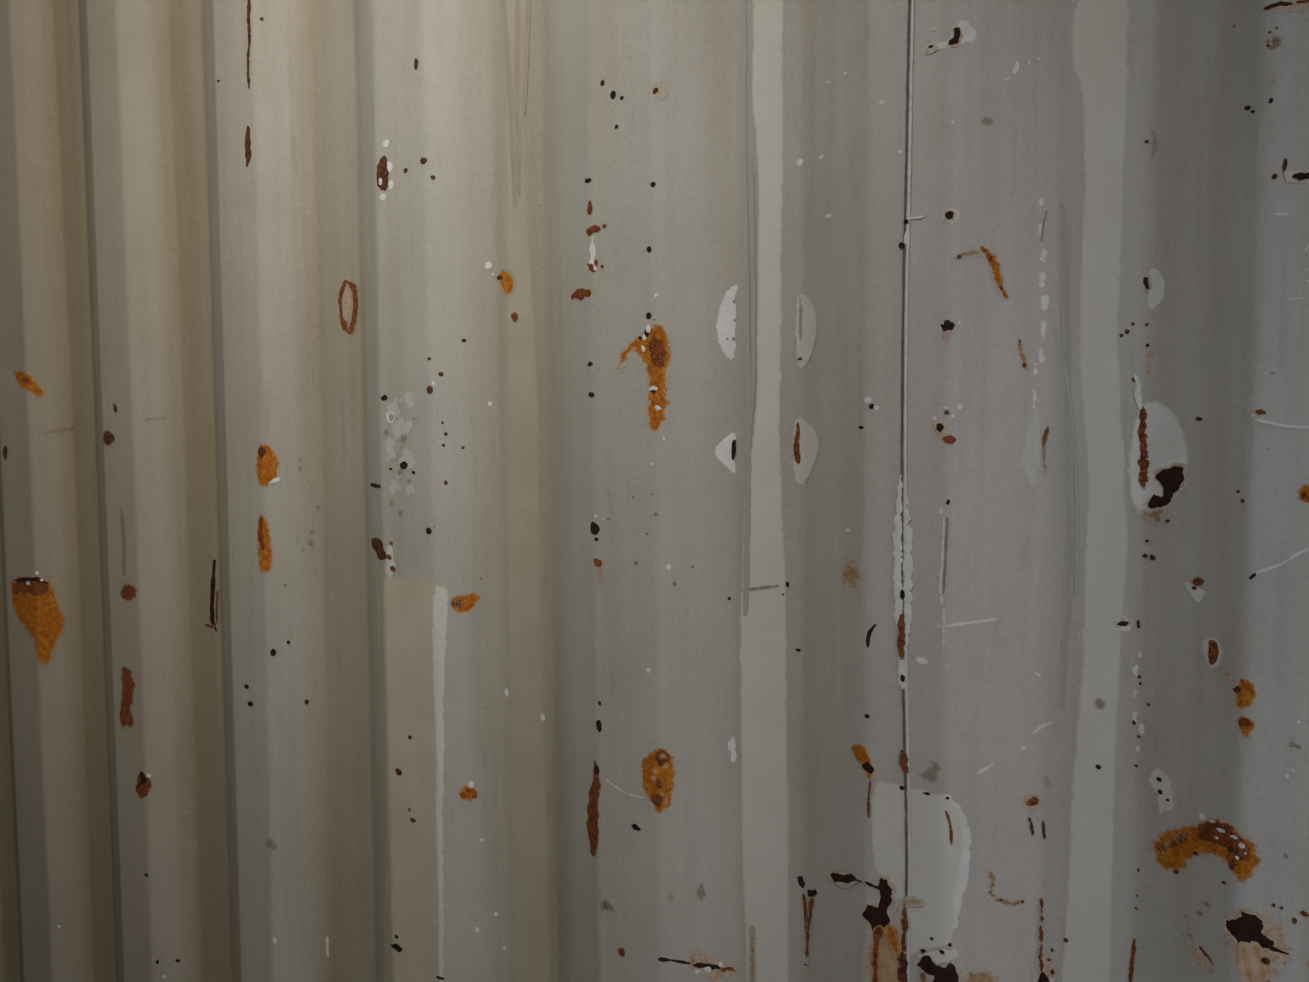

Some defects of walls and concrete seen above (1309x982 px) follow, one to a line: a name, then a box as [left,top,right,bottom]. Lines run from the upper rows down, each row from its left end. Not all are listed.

rust [955,244,1011,301]
rust [613,312,677,440]
peeling [716,285,738,360]
rust [1015,337,1031,372]
rust [253,441,304,490]
rust [9,571,70,669]
rust [638,746,679,817]
peeling [824,780,1004,982]
rust [1137,813,1290,888]
rust [986,869,1068,982]
rust [1127,938,1137,982]
spalling [1219,903,1309,982]